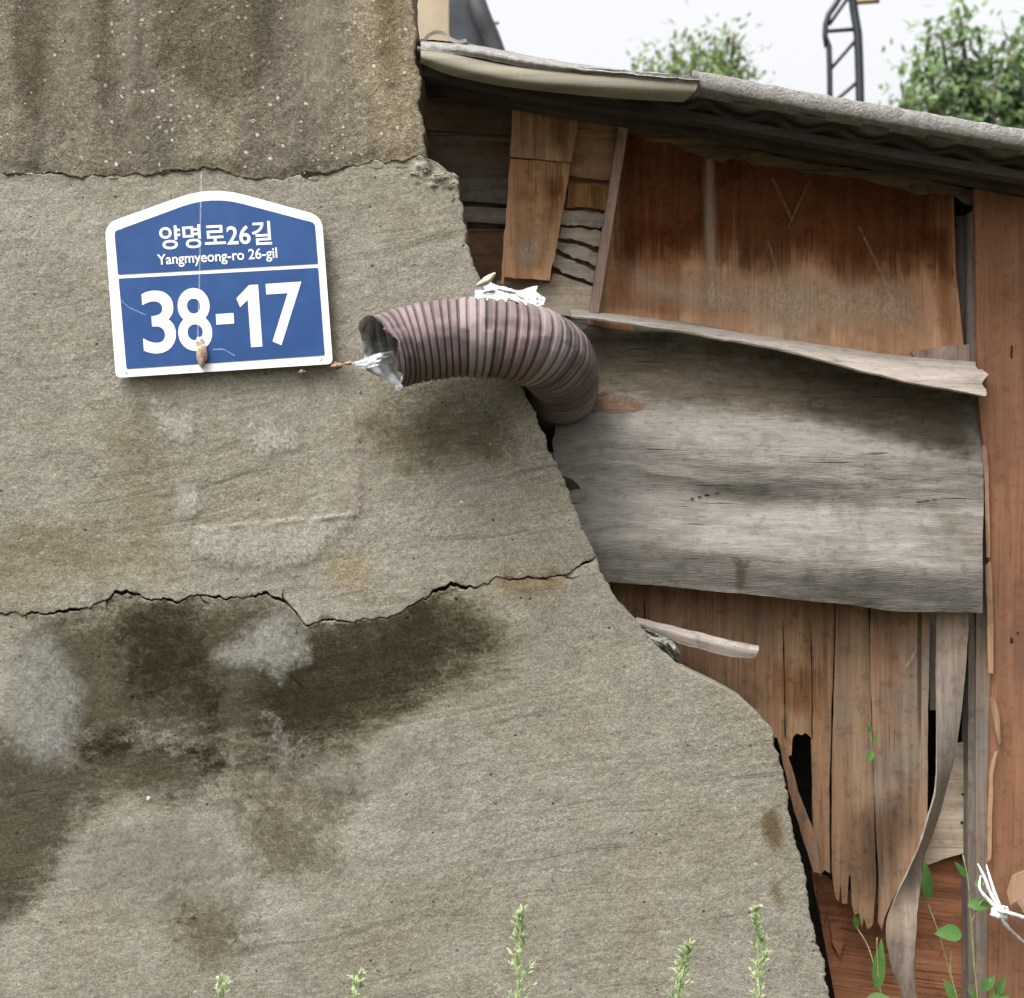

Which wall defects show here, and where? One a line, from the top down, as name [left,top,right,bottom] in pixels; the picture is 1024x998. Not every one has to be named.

crack [3,170,67,178]
crack [158,168,201,176]
crack [301,164,409,181]
crack [0,560,591,627]
leakage [217,613,308,675]
leakage [10,638,78,759]